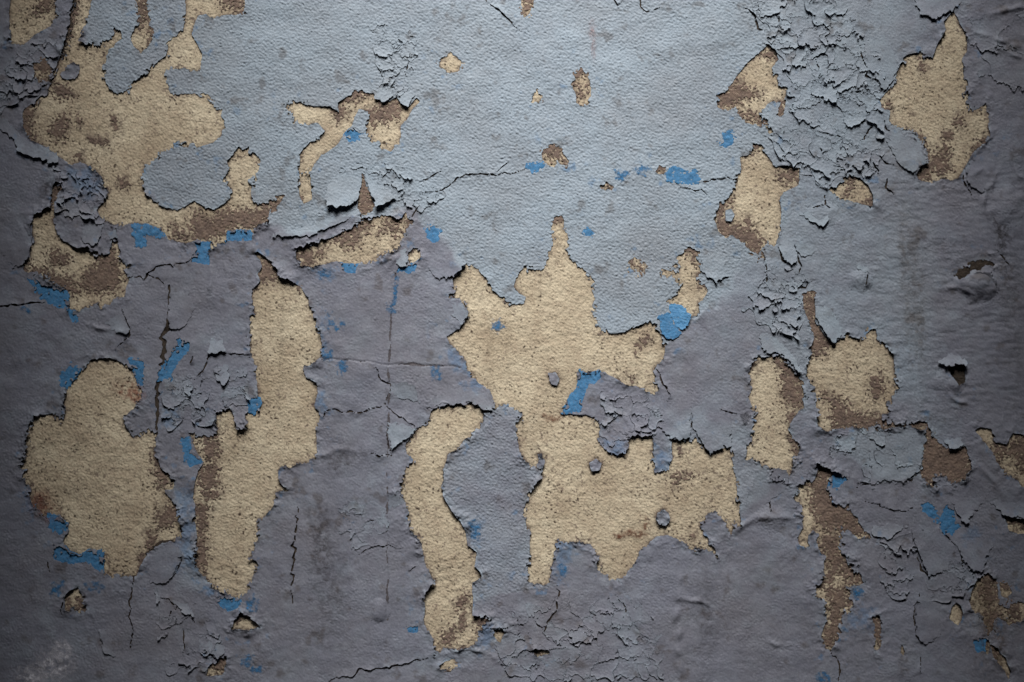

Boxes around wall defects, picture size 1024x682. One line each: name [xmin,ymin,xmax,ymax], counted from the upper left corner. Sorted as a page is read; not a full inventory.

peeling [0,0,285,334]
peeling [18,252,348,676]
crack [290,506,299,603]
crack [321,273,459,621]
crack [411,162,525,217]
peeling [272,0,1024,682]
crack [913,557,934,674]